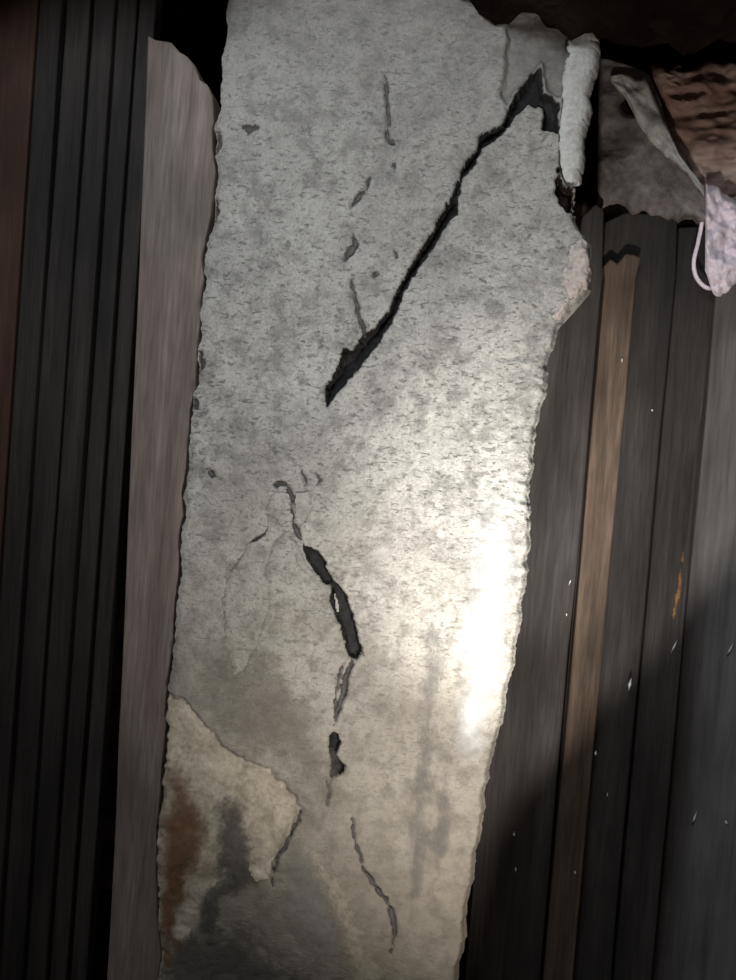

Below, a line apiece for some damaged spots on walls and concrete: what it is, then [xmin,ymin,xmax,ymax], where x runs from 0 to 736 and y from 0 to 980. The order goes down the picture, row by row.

crack [324,67,560,407]
crack [555,167,574,215]
peeling [692,184,736,297]
crack [273,470,364,807]
peeling [157,694,301,955]
crack [271,810,301,887]
peeling [311,851,384,980]
crack [351,818,397,954]